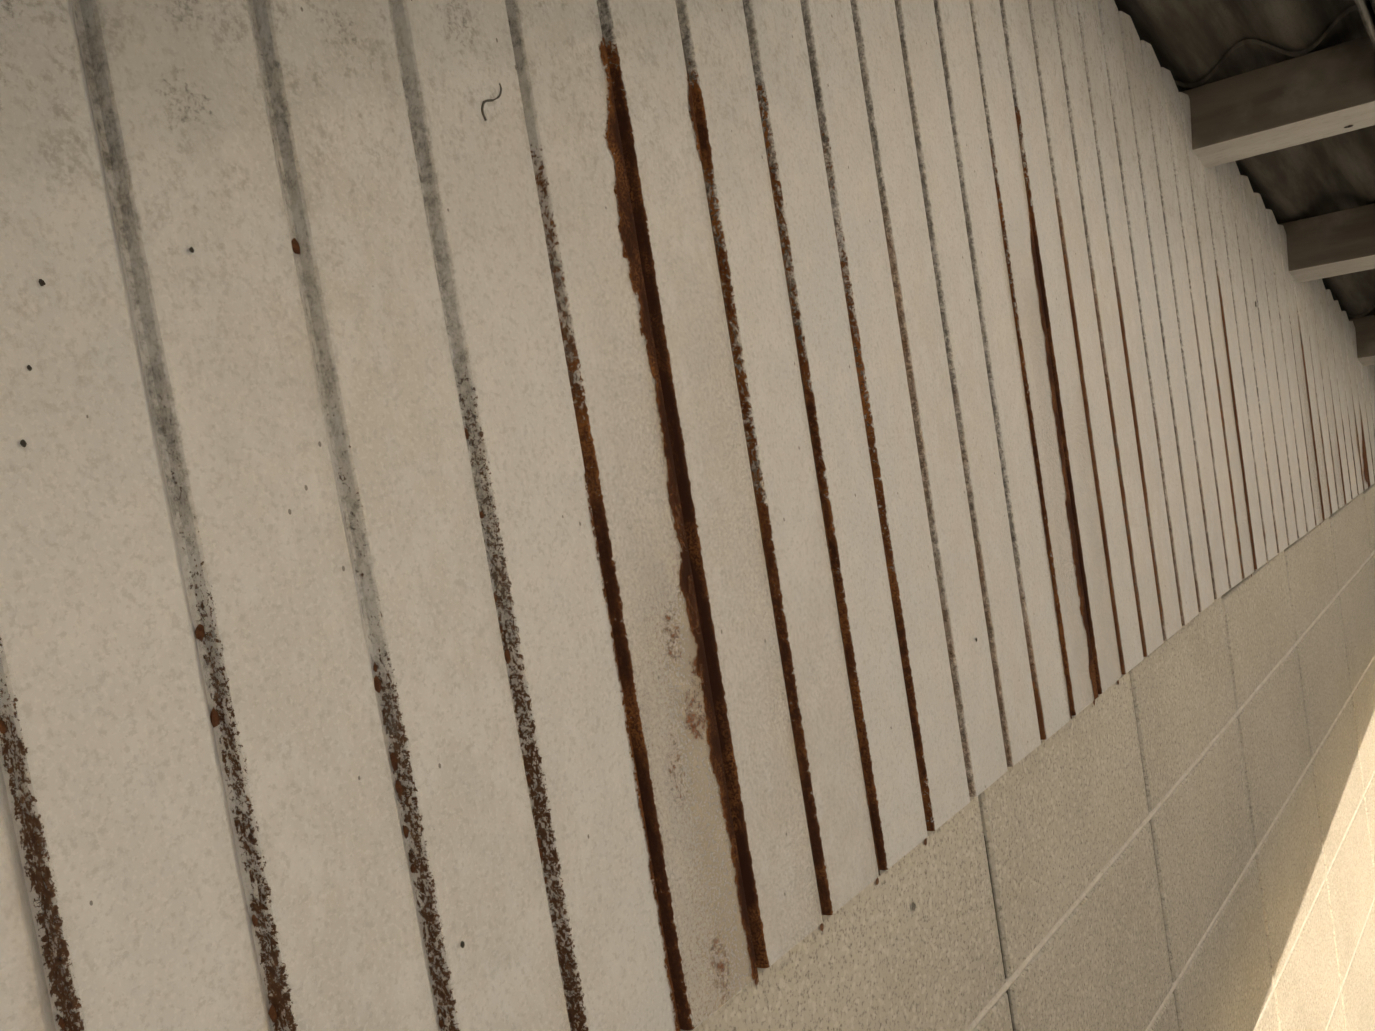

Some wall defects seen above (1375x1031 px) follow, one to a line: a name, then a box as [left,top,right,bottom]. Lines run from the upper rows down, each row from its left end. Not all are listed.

rust [0,676,84,1031]
rust [160,396,298,1031]
rust [291,238,300,254]
rust [338,434,461,1031]
rust [530,37,770,1031]
rust [686,61,833,932]
rust [819,114,935,846]
rust [990,139,1076,718]
rust [1024,622,1046,740]
rust [1015,106,1126,705]
rust [1090,270,1147,657]
rust [1113,272,1375,640]